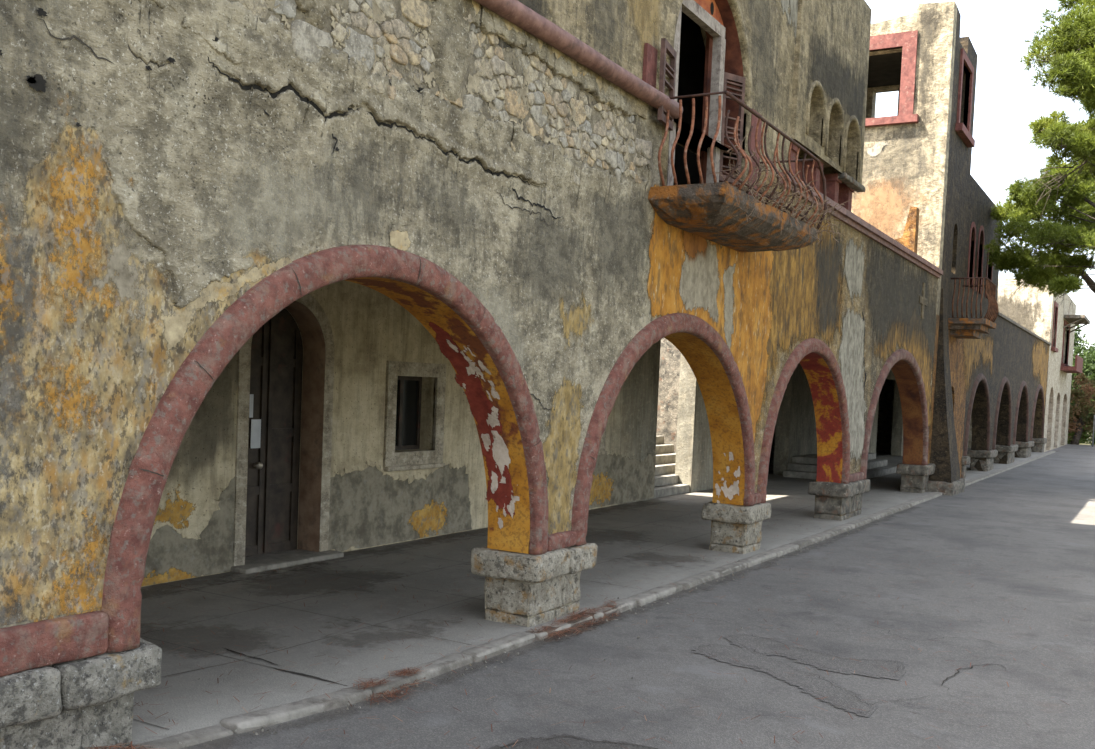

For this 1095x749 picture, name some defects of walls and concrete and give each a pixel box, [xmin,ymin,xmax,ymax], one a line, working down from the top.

spalling [26,74,47,93]
crack [36,0,654,226]
flaking render [228,0,652,186]
peeling [0,96,292,626]
peeling [328,322,520,552]
peeling [647,211,774,443]
peeling [715,452,740,504]